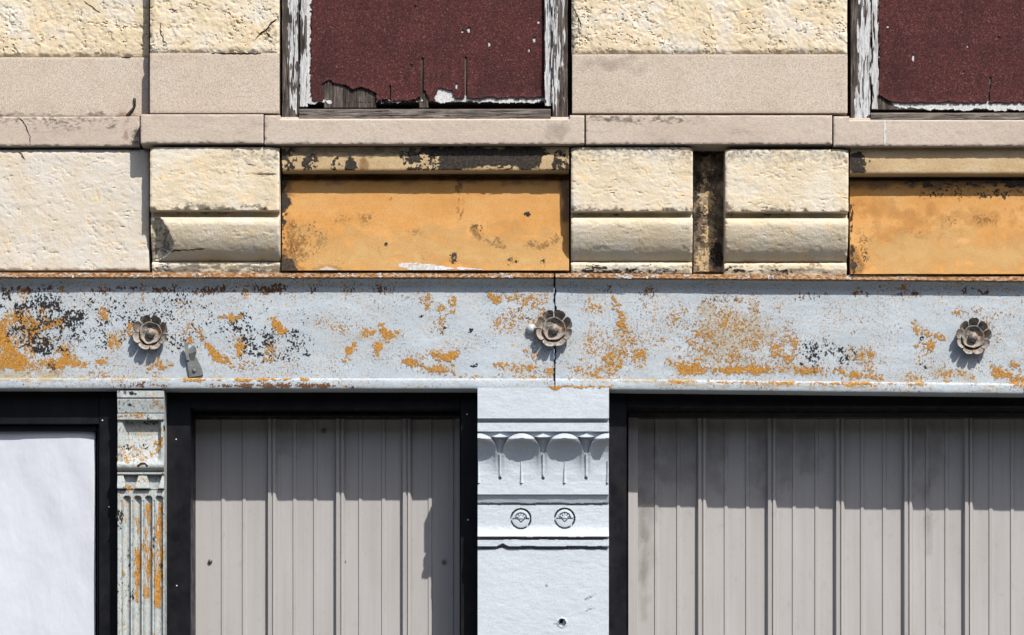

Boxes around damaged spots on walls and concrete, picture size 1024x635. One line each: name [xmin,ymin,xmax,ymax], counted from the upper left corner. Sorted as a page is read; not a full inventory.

peeling [287,0,332,114]
peeling [854,0,890,118]
peeling [891,101,1024,111]
peeling [282,147,569,278]
water stain [574,151,746,274]
peeling [0,290,318,370]
crack [550,345,558,386]
crack [551,274,559,312]
peeling [797,334,859,374]